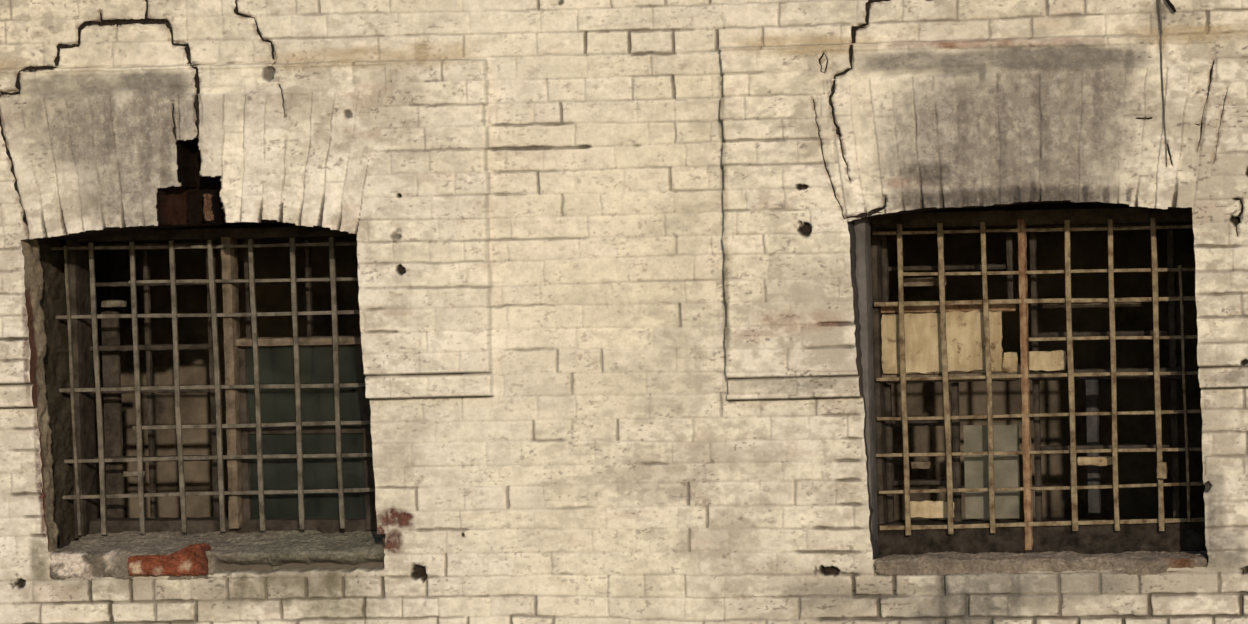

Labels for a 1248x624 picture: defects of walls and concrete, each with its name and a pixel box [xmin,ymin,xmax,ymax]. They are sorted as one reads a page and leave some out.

crack [0,0,200,227]
crack [234,0,285,118]
crack [813,0,890,219]
crack [1167,61,1228,166]
spalling [184,140,226,225]
spalling [127,543,211,576]
peeling [377,508,412,553]